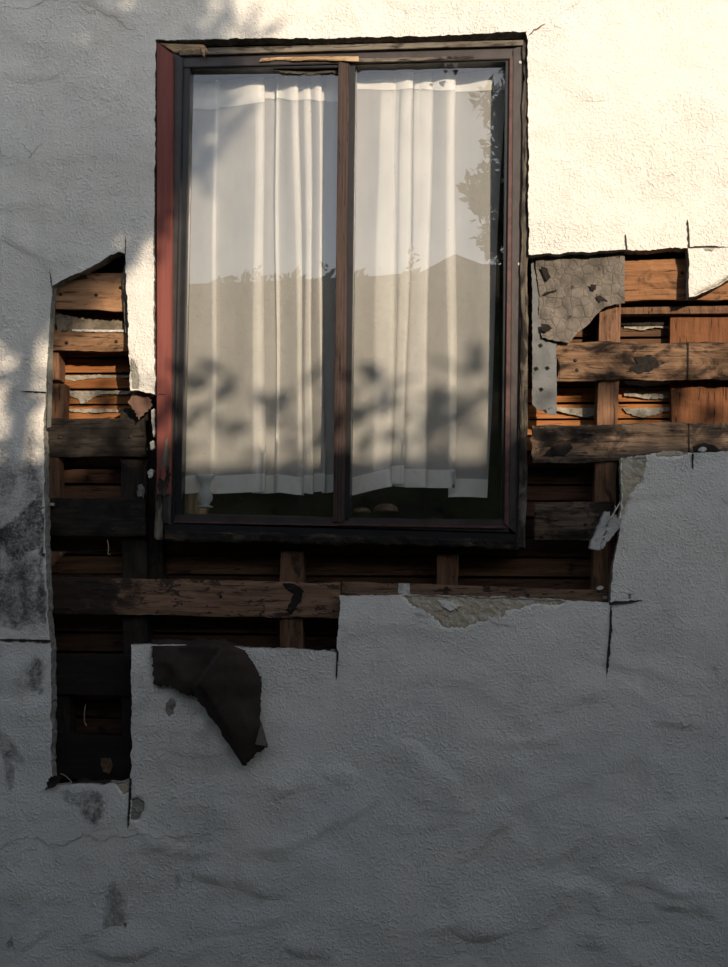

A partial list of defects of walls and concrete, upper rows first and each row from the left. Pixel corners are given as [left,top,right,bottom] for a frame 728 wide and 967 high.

flaking render [130,359,139,389]
flaking render [620,450,686,519]
flaking render [404,595,564,629]
flaking render [165,699,176,717]